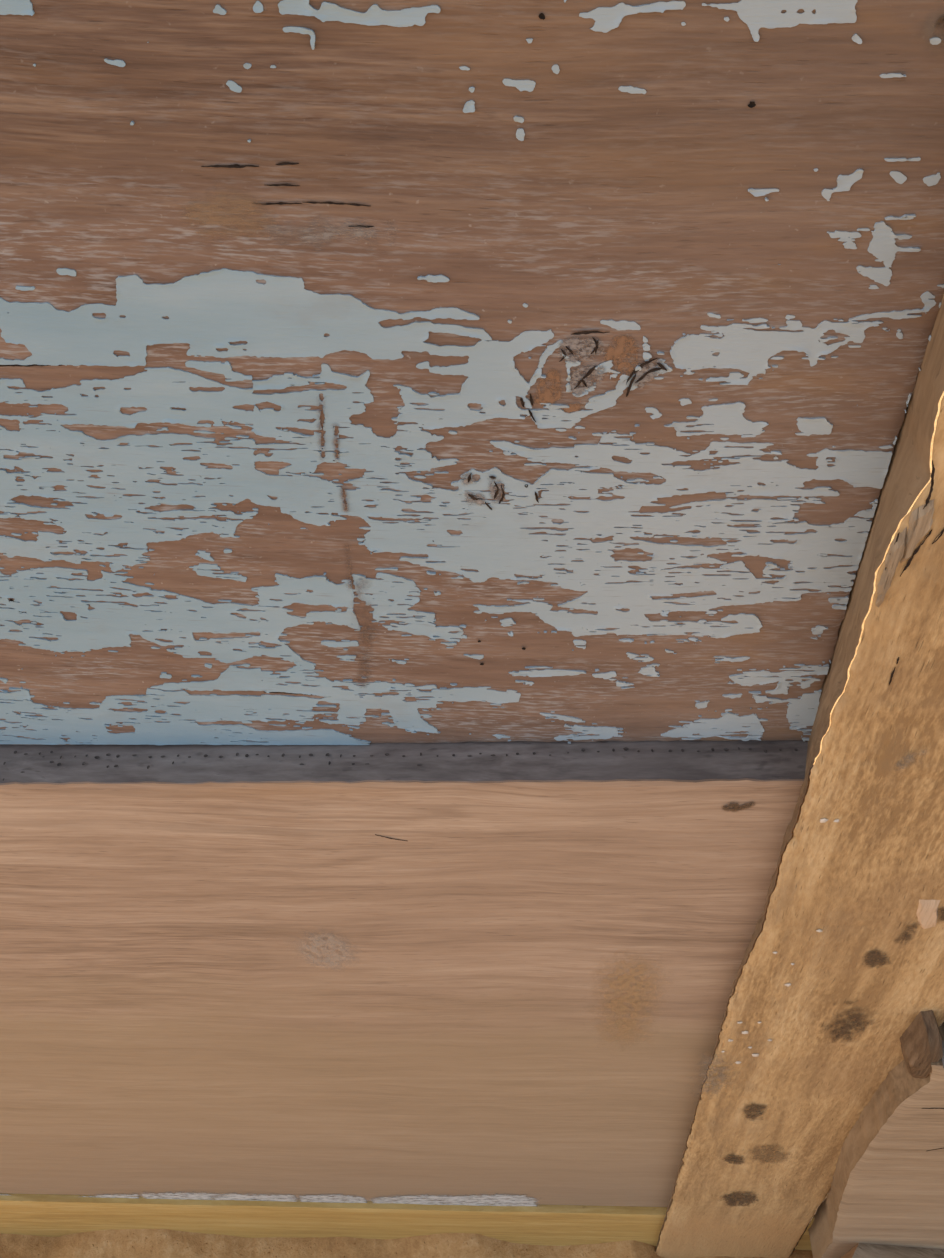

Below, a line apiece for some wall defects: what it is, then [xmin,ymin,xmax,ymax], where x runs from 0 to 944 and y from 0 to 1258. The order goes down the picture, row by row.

peeling [0,0,35,16]
peeling [253,0,441,50]
peeling [579,1,686,33]
peeling [702,0,862,44]
peeling [502,79,536,92]
peeling [821,169,864,201]
peeling [884,157,921,184]
peeling [827,214,921,289]
crack [559,331,609,389]
crack [626,358,667,397]
crack [520,393,536,422]
peeling [0,268,944,745]